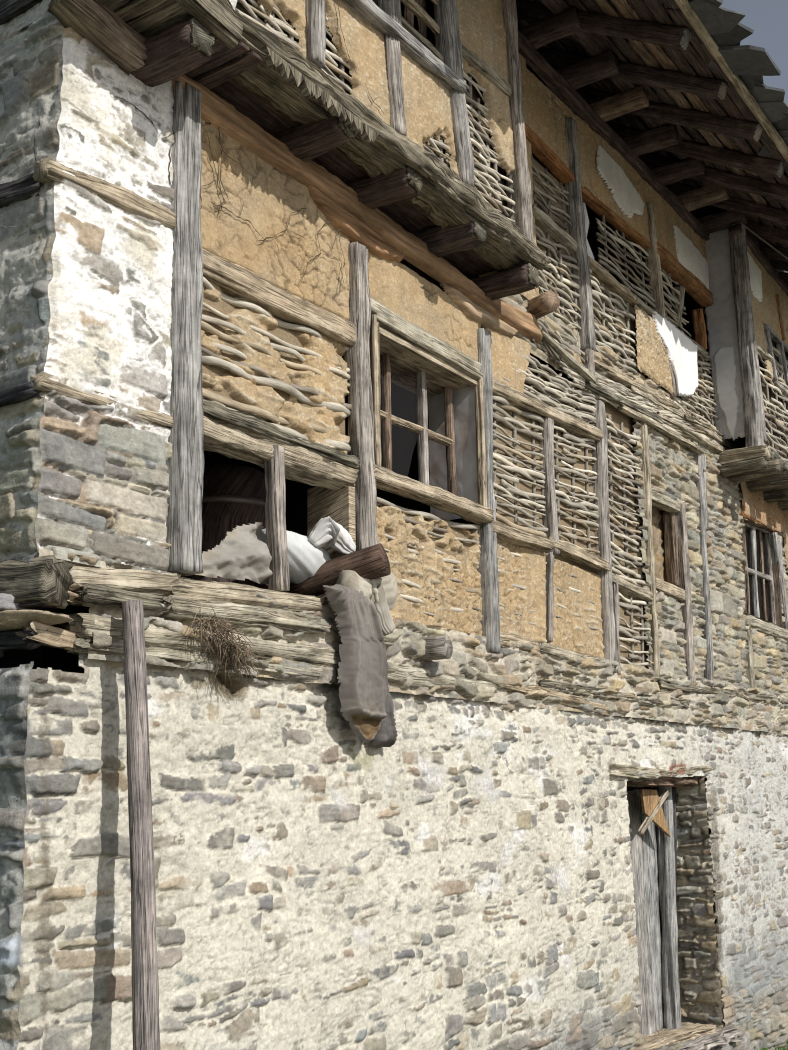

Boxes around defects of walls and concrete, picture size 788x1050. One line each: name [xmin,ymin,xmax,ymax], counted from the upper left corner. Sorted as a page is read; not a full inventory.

spalling [235,0,301,50]
spalling [321,17,352,95]
crack [117,96,175,188]
crack [200,127,345,292]
spalling [423,134,451,166]
spalling [463,70,516,223]
peeling [596,145,645,219]
peeling [673,225,709,290]
peeling [652,311,699,397]